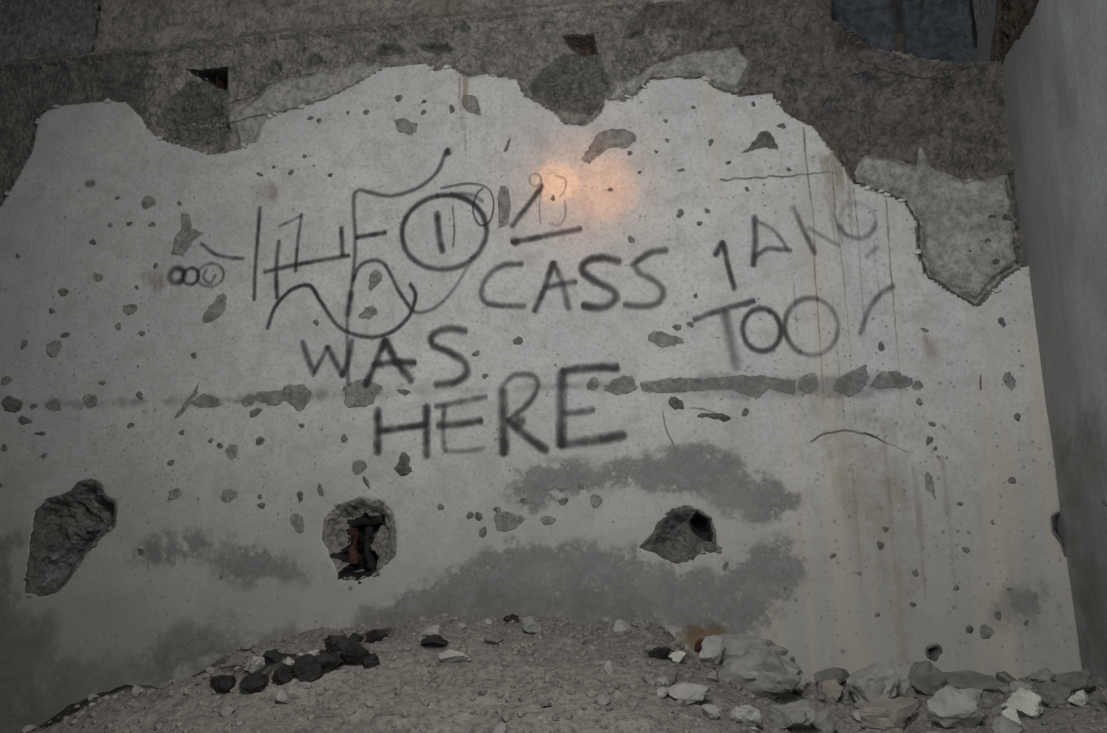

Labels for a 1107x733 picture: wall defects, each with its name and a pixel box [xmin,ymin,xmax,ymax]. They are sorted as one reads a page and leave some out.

spalling [0,0,1039,307]
spalling [46,332,70,358]
spalling [115,304,138,330]
flaking render [202,293,227,323]
flaking render [358,305,378,319]
spalling [23,478,117,597]
spalling [290,491,305,534]
spalling [322,460,397,584]
leakage [511,443,800,522]
spalling [639,505,728,571]
leakage [357,539,803,635]
leakage [0,537,73,733]